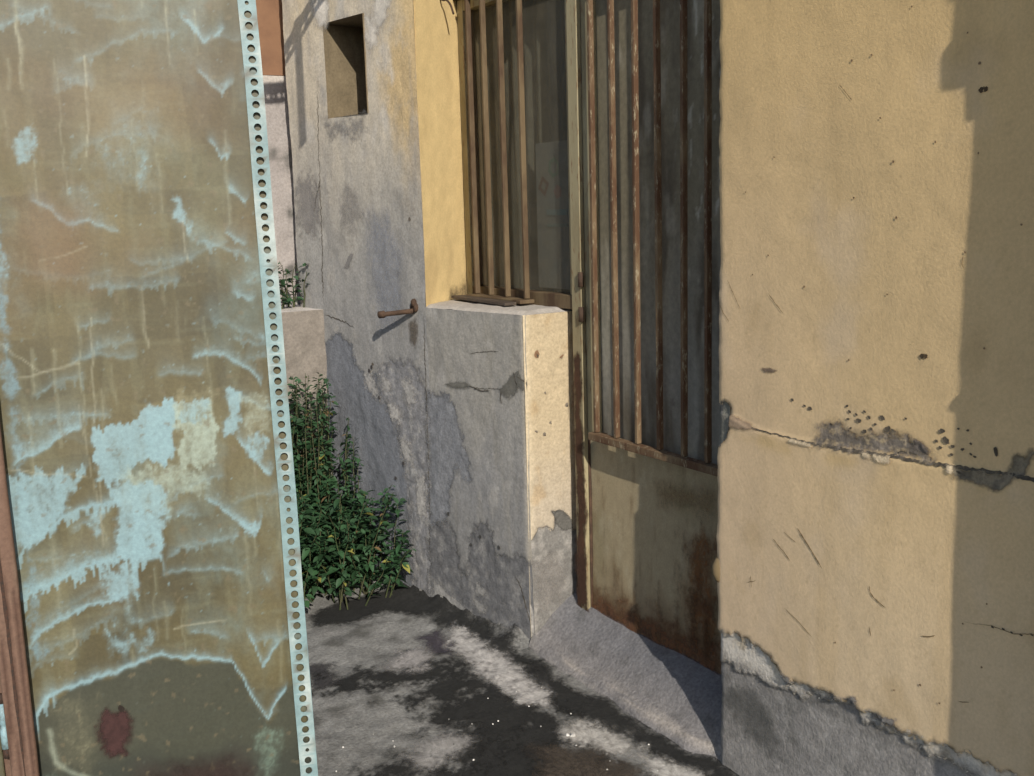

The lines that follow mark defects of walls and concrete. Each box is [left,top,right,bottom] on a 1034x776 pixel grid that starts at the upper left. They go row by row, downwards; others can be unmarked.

flaking render [325,332,578,640]
rust [571,353,719,674]
crack [752,427,1034,482]
peeling [814,405,1034,492]
water stain [385,647,433,672]
water stain [445,625,553,707]
flaking render [719,631,1017,776]
water stain [406,733,473,770]
water stain [559,720,704,776]